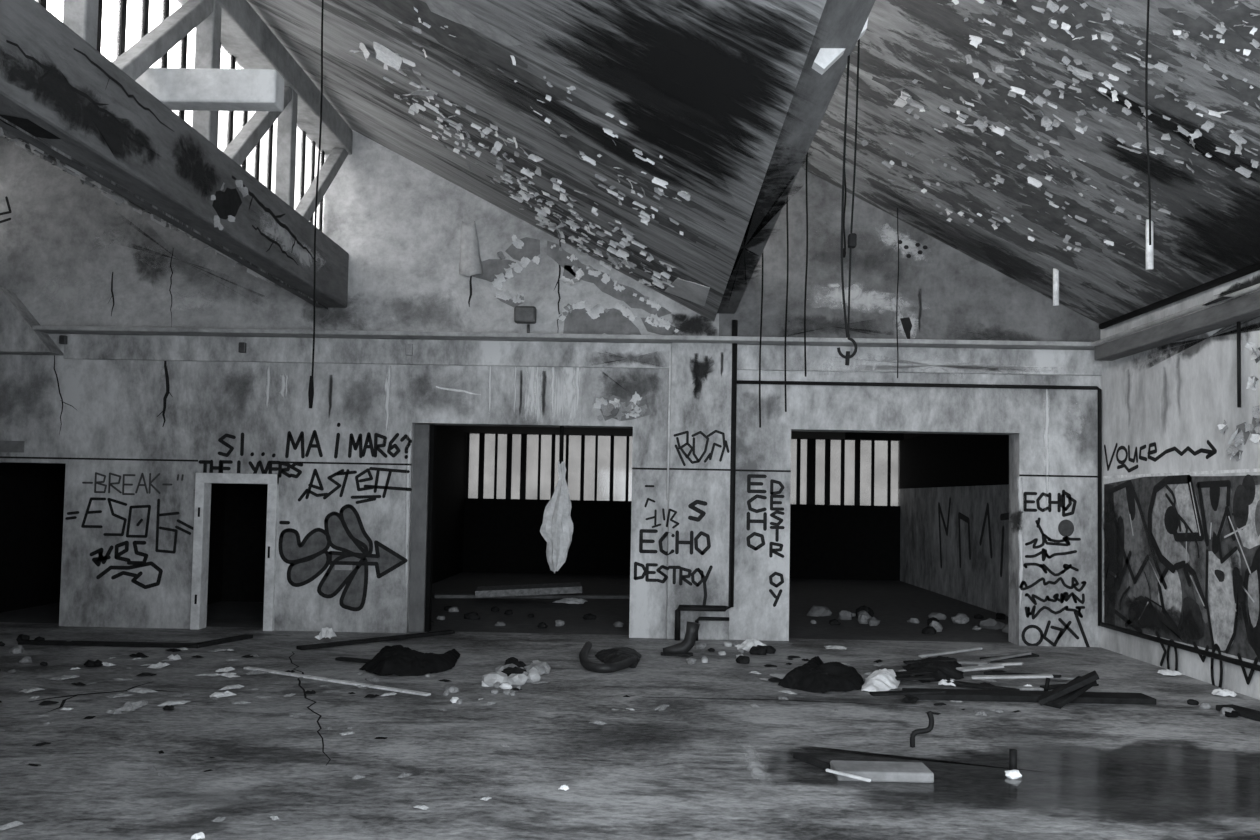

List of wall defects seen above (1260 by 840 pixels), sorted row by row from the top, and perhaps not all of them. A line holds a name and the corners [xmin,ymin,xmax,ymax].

water stain [0,48,159,162]
peeling [0,115,299,293]
water stain [174,138,218,197]
peeling [350,0,726,335]
peeling [860,0,1260,255]
crack [167,248,175,327]
crack [157,361,172,427]
flaking render [1217,342,1260,461]